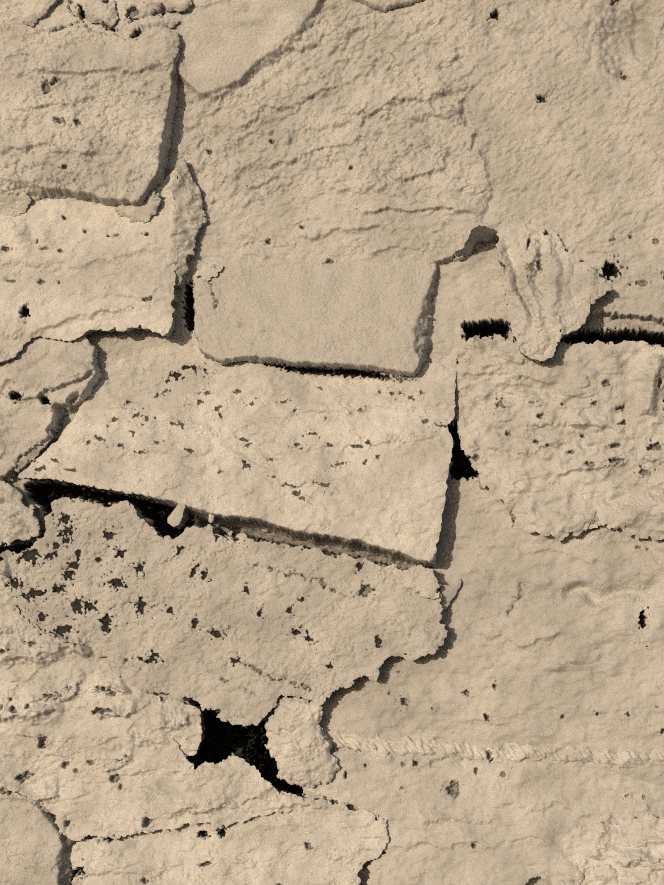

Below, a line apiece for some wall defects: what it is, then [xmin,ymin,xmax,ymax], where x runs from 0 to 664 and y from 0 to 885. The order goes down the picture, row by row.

peeling [353,0,424,13]
crack [182,281,219,333]
crack [264,363,389,379]
crack [448,422,479,481]
crack [0,537,43,561]
crack [25,480,412,571]
peeling [0,218,664,885]
crack [254,564,345,597]